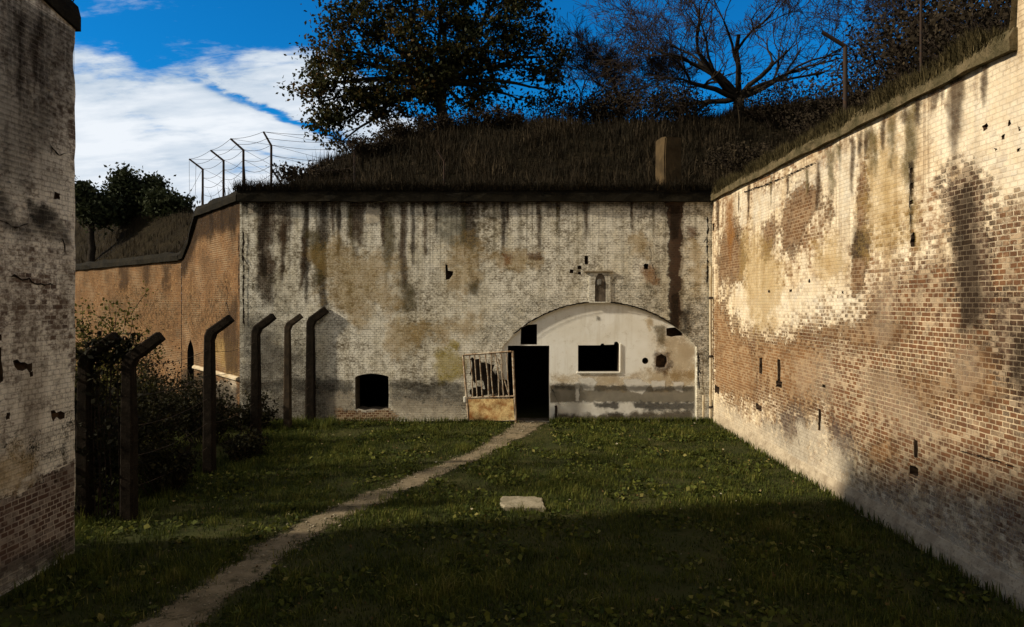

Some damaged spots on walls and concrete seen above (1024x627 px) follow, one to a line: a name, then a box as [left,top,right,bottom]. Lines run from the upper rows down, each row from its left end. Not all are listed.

water stain [0,4,69,176]
water stain [805,77,963,207]
crack [6,274,55,286]
water stain [380,202,438,285]
water stain [460,205,478,250]
water stain [500,202,509,253]
water stain [652,202,685,342]
spalling [0,334,33,383]
peeling [556,354,684,417]
peeling [712,155,1024,568]
peeling [0,402,75,575]